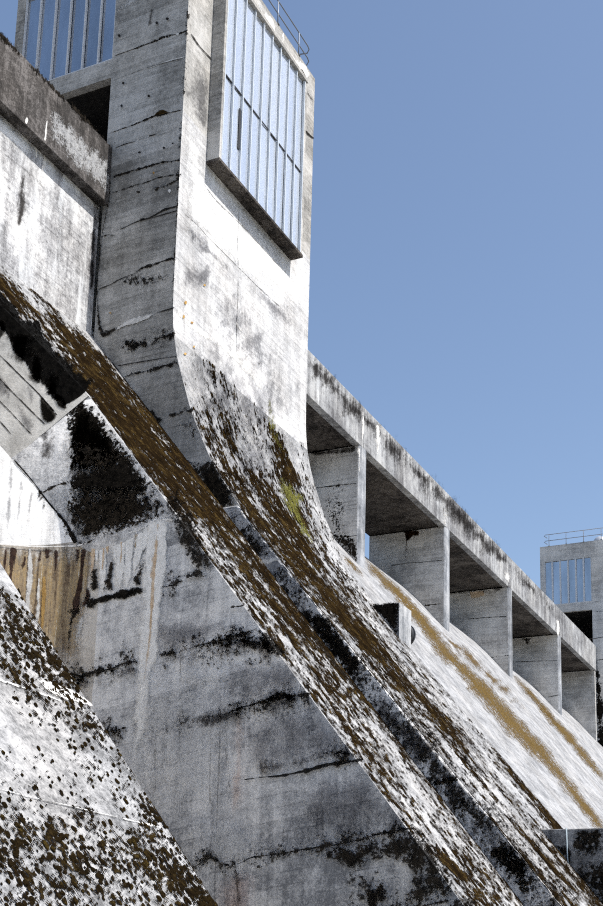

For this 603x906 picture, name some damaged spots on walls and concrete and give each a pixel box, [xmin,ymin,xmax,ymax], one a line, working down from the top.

corrosion [0,546,109,660]
leakage [0,292,213,752]
leakage [188,460,603,906]
leakage [308,364,506,562]